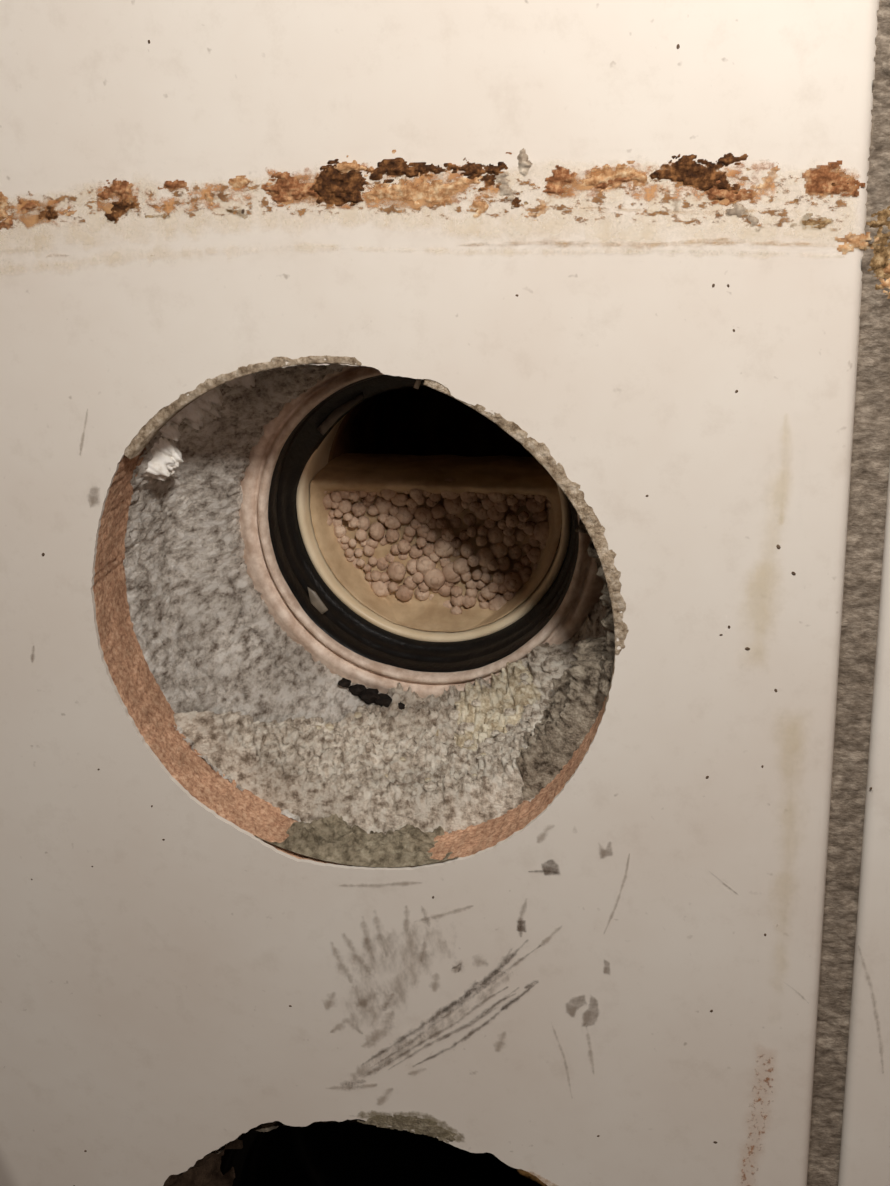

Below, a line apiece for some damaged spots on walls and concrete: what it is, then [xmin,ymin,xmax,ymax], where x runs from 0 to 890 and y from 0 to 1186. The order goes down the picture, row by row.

rust [0,150,890,299]